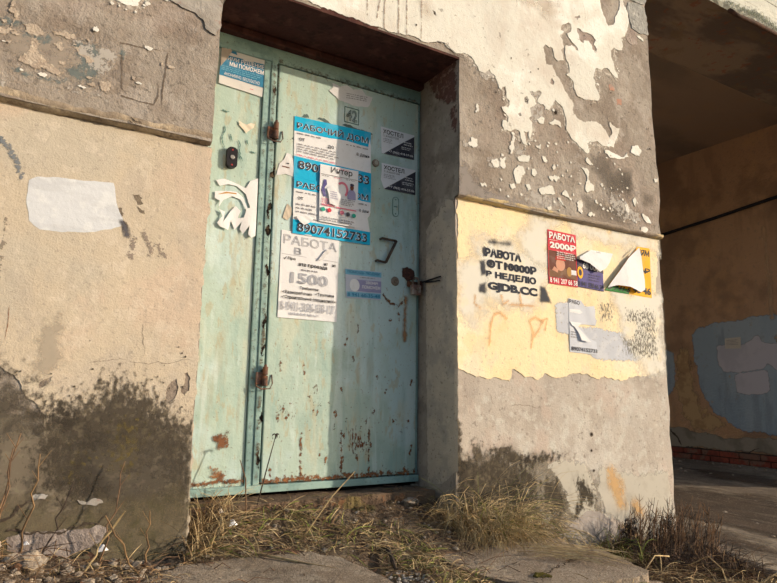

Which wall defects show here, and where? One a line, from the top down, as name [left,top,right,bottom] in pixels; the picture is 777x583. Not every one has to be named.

peeling [0,0,99,77]
peeling [78,76,111,92]
peeling [103,0,151,14]
flaking render [165,0,222,36]
peeling [429,62,457,132]
peeling [483,71,623,197]
peeling [552,16,596,95]
flaking render [589,0,648,105]
water stain [0,322,193,561]
peeling [669,349,777,456]
water stain [456,420,777,554]